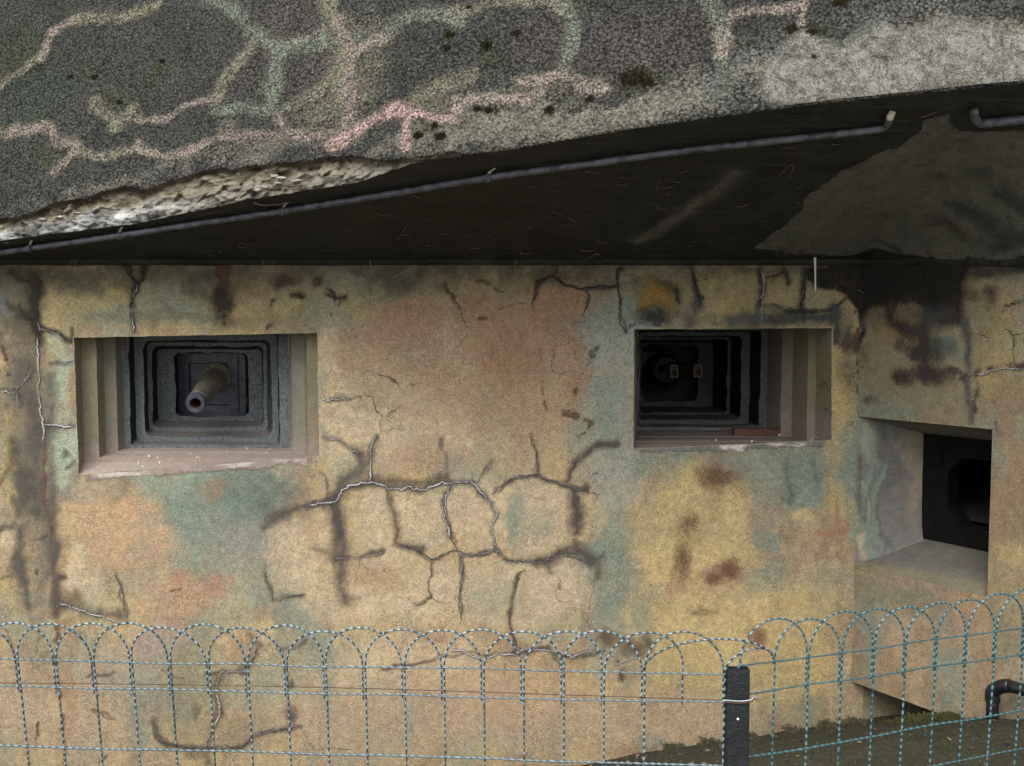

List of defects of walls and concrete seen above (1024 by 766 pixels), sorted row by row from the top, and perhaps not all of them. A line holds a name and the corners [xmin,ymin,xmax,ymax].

spalling [0,0,611,244]
peeling [754,114,1024,260]
crack [124,265,147,332]
crack [532,265,629,333]
leakage [714,265,1024,424]
leakage [0,438,37,609]
crack [0,279,127,756]
crack [264,563,305,602]
crack [304,370,619,688]